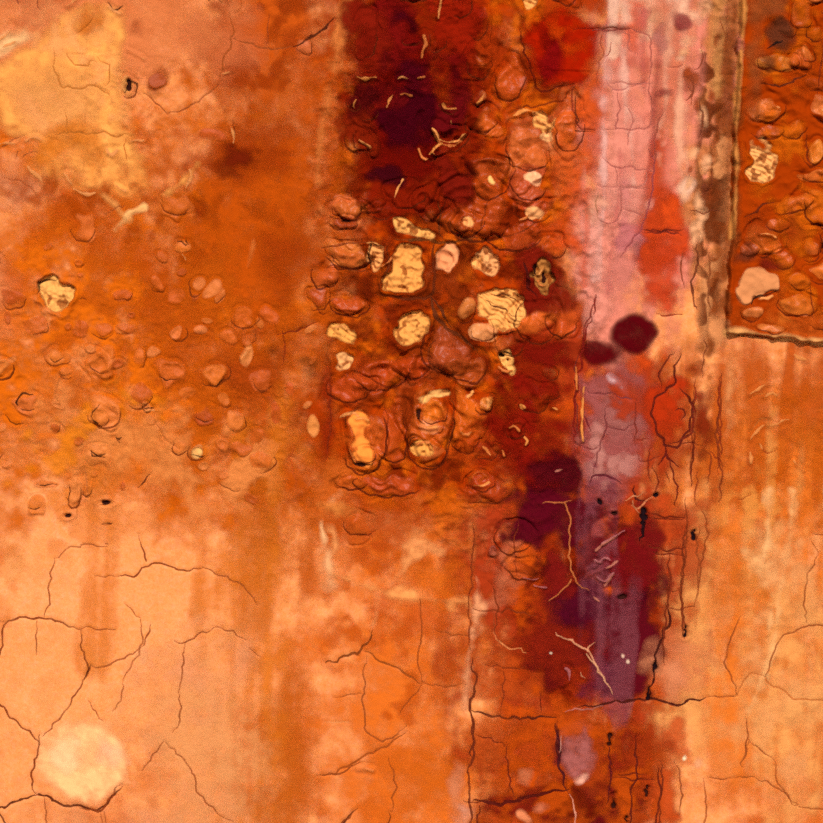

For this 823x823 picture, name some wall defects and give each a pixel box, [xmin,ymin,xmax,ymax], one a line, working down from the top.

damp [0,0,213,93]
corrosion [201,0,359,218]
spalling [366,217,434,292]
spalling [394,311,430,345]
spalling [436,242,458,272]
spalling [478,288,526,331]
corrosion [640,160,689,311]
corrosion [533,251,823,795]
crack [572,297,823,707]
crack [0,504,150,823]
damp [159,632,307,823]
crack [323,527,569,823]